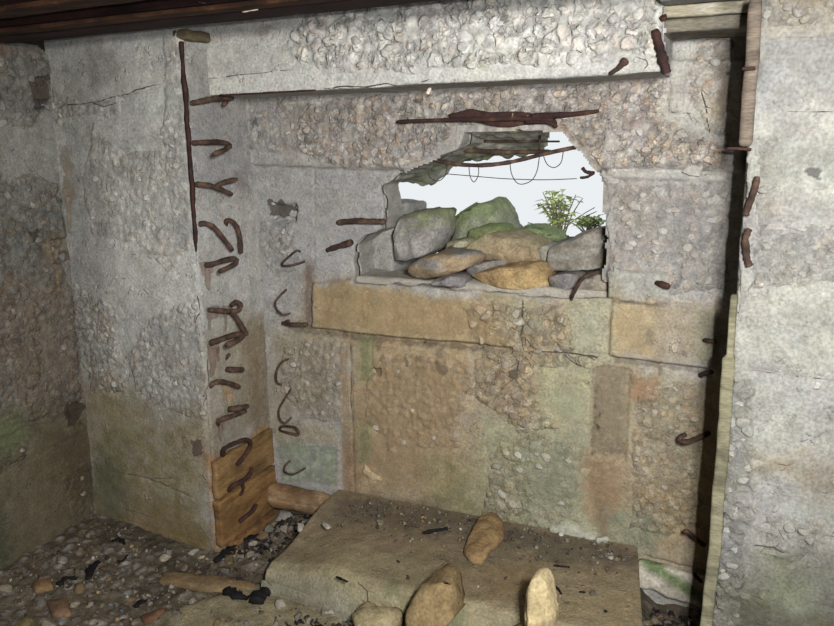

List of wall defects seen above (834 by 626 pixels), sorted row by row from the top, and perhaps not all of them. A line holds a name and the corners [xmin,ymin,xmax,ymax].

spalling [268,0,666,80]
rust [609,57,629,76]
rust [651,28,671,75]
crack [50,85,153,114]
spalling [248,37,736,300]
spalling [741,136,834,296]
rust [199,262,213,290]